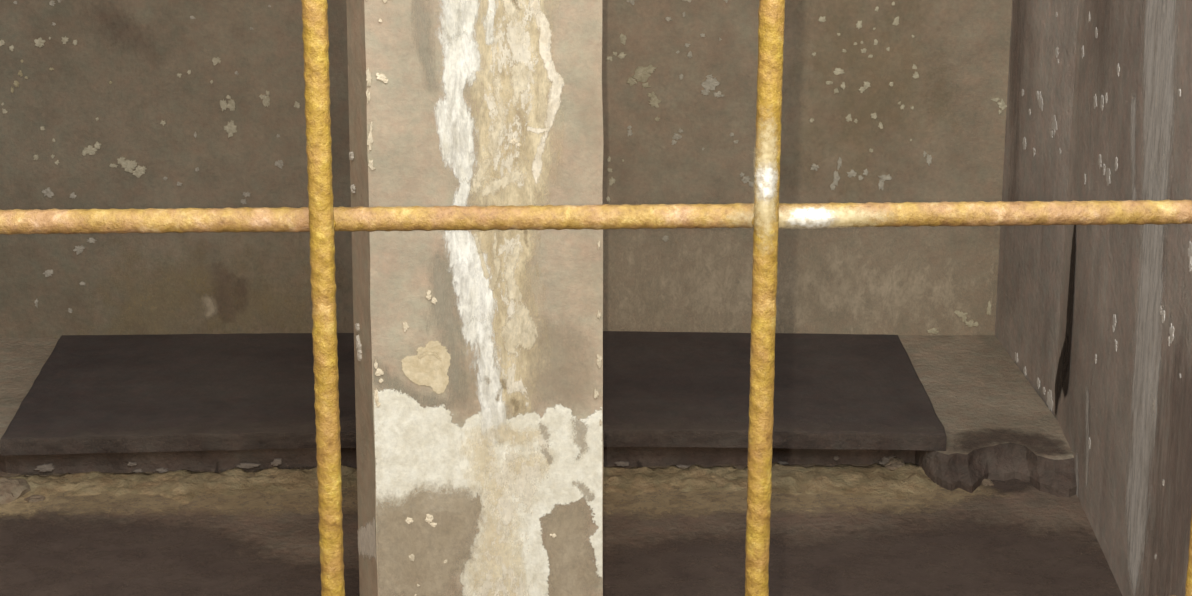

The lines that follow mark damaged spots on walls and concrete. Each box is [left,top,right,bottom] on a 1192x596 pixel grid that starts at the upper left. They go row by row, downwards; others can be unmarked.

water stain [415,0,565,206]
crack [1055,225,1076,414]
peeling [355,323,629,596]